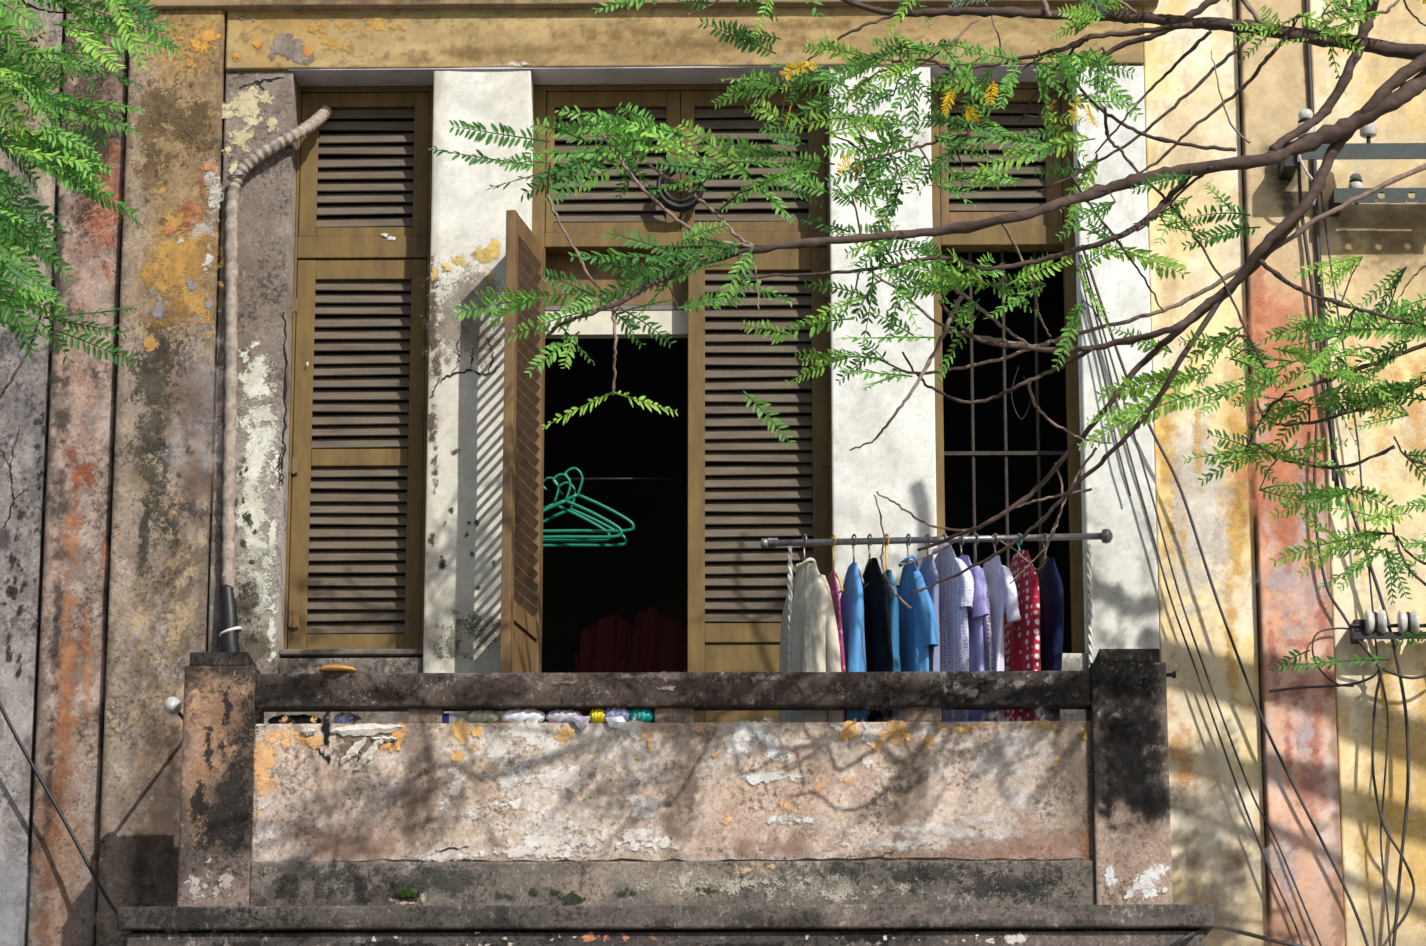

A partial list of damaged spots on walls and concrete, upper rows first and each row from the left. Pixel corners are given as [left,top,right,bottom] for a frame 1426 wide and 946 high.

peeling [91,27,279,353]
crack [429,331,499,398]
crack [0,425,28,547]
peeling [235,341,284,663]
damp [236,558,423,713]
damp [90,686,499,946]
peeling [188,690,408,845]
peeling [440,717,591,819]
peeling [406,793,680,862]
peeling [689,717,856,825]
peeling [830,719,1060,850]
damp [691,928,926,946]